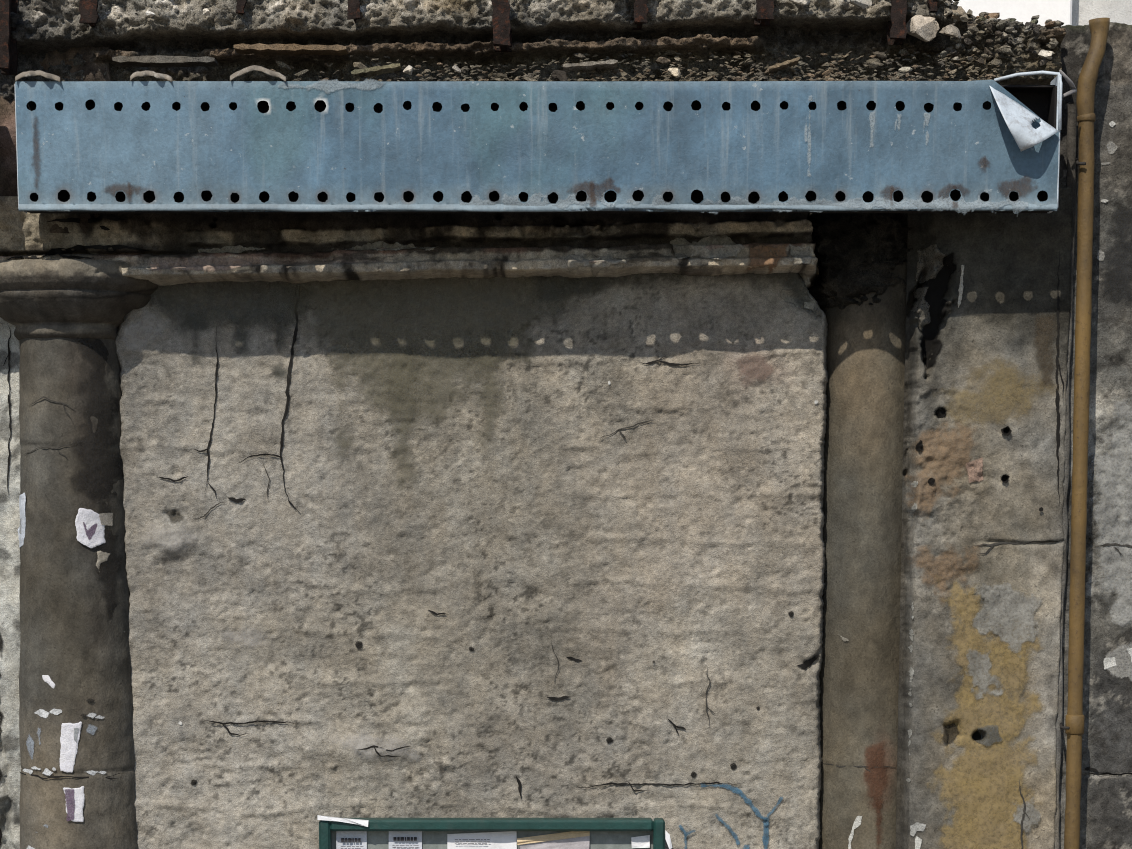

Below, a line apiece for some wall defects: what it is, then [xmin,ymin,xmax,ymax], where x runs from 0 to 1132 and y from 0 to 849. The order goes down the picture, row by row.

water stain [715,272,817,312]
spalling [910,244,964,369]
crack [3,323,77,494]
crack [159,283,300,519]
water stain [149,273,696,481]
spalling [973,583,1042,652]
spalling [967,650,1003,699]
crack [206,720,295,736]
spalling [942,724,1002,746]
peeling [1013,799,1040,832]